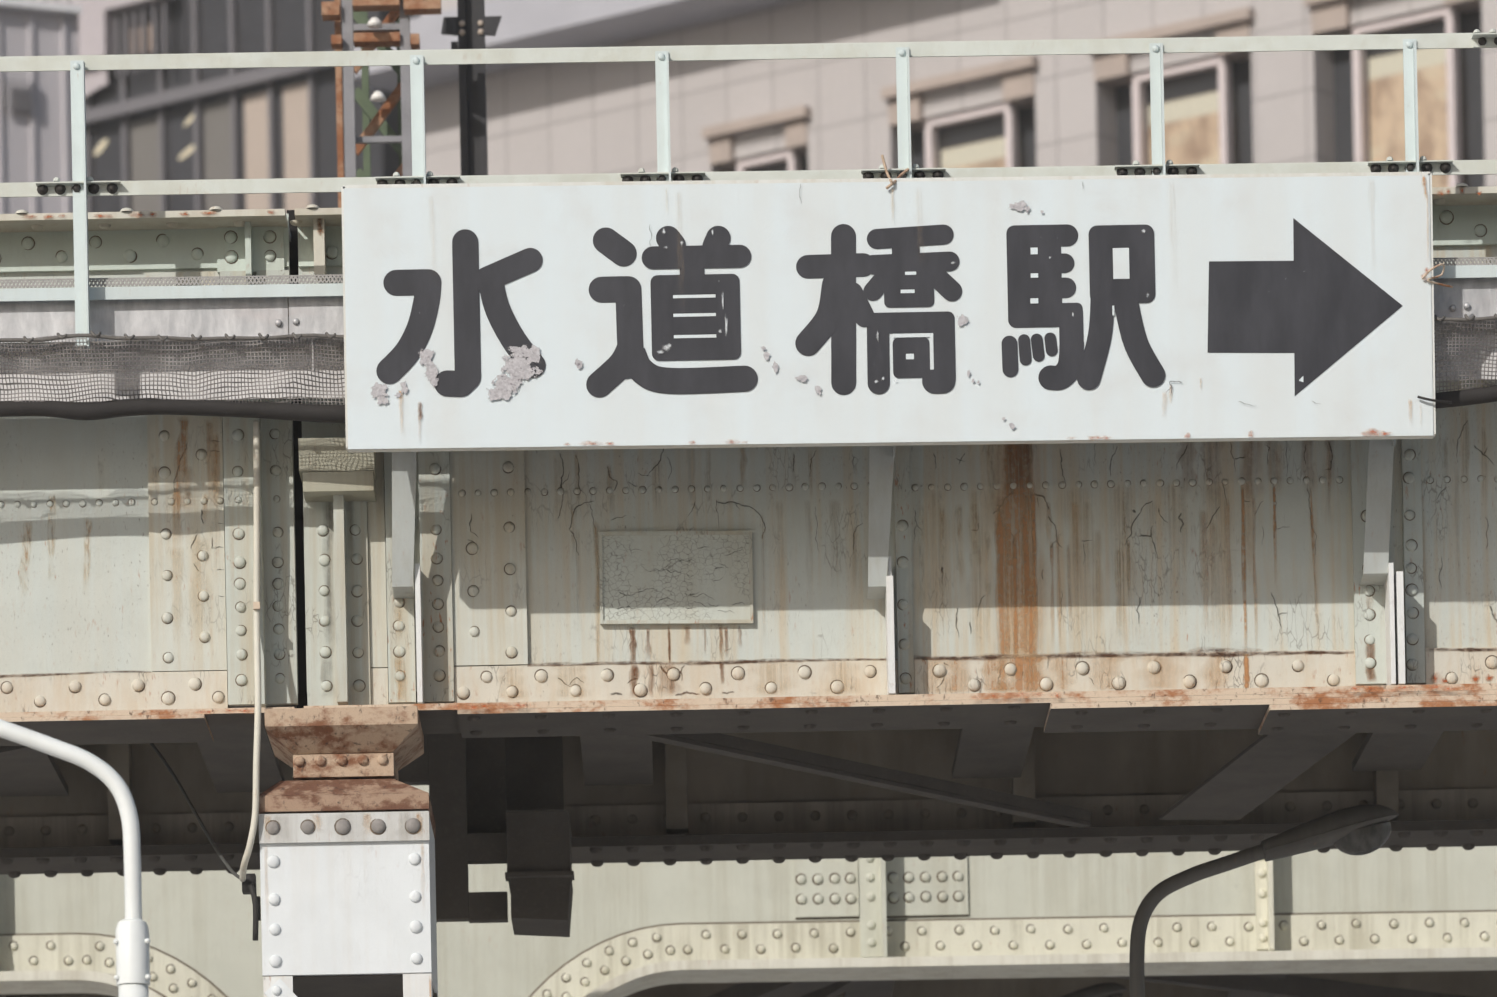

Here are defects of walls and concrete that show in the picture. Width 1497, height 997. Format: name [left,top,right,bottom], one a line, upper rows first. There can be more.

peeling [371,381,408,405]
peeling [418,349,439,387]
peeling [488,344,543,401]
crack [558,448,765,612]
rust [916,444,1347,698]
rust [534,628,886,693]